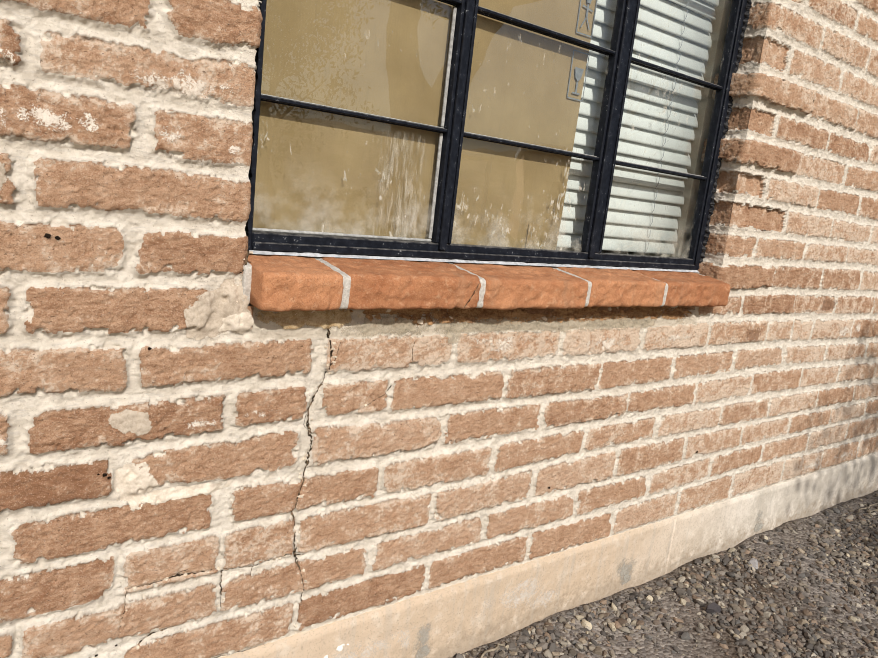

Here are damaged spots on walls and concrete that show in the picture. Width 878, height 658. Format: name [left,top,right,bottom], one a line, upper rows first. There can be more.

leakage [134,69,233,102]
leakage [0,105,103,135]
leakage [155,126,183,143]
crack [118,327,340,649]